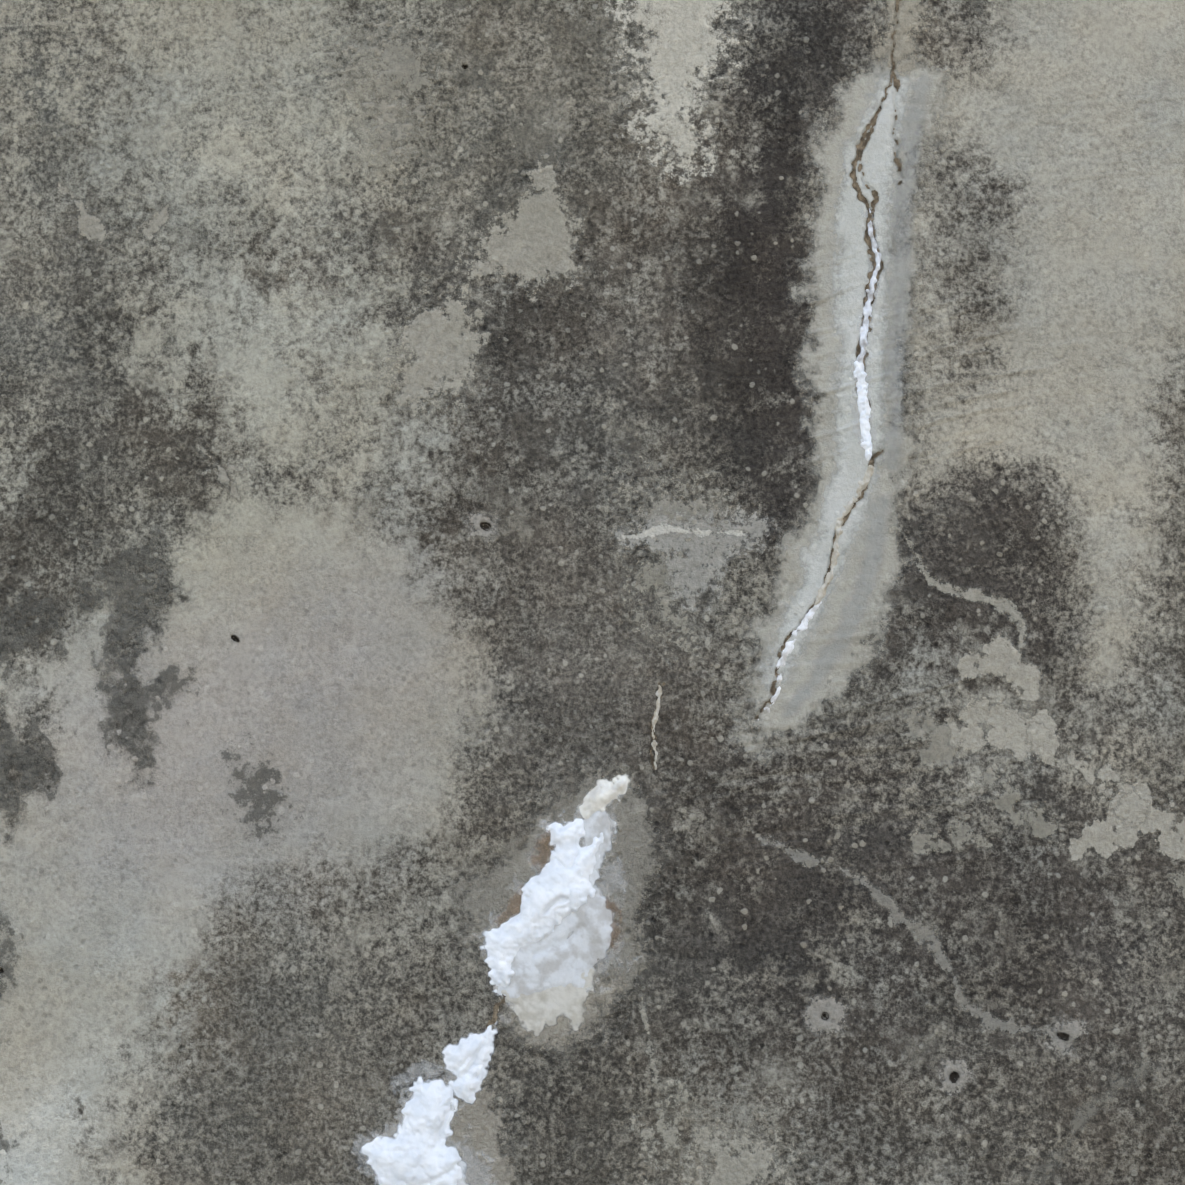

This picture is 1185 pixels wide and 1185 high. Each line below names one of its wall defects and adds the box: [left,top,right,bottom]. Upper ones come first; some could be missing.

crack [755,0,902,720]
crack [650,682,666,770]
crack [486,994,506,1029]
leakage [360,760,663,1185]